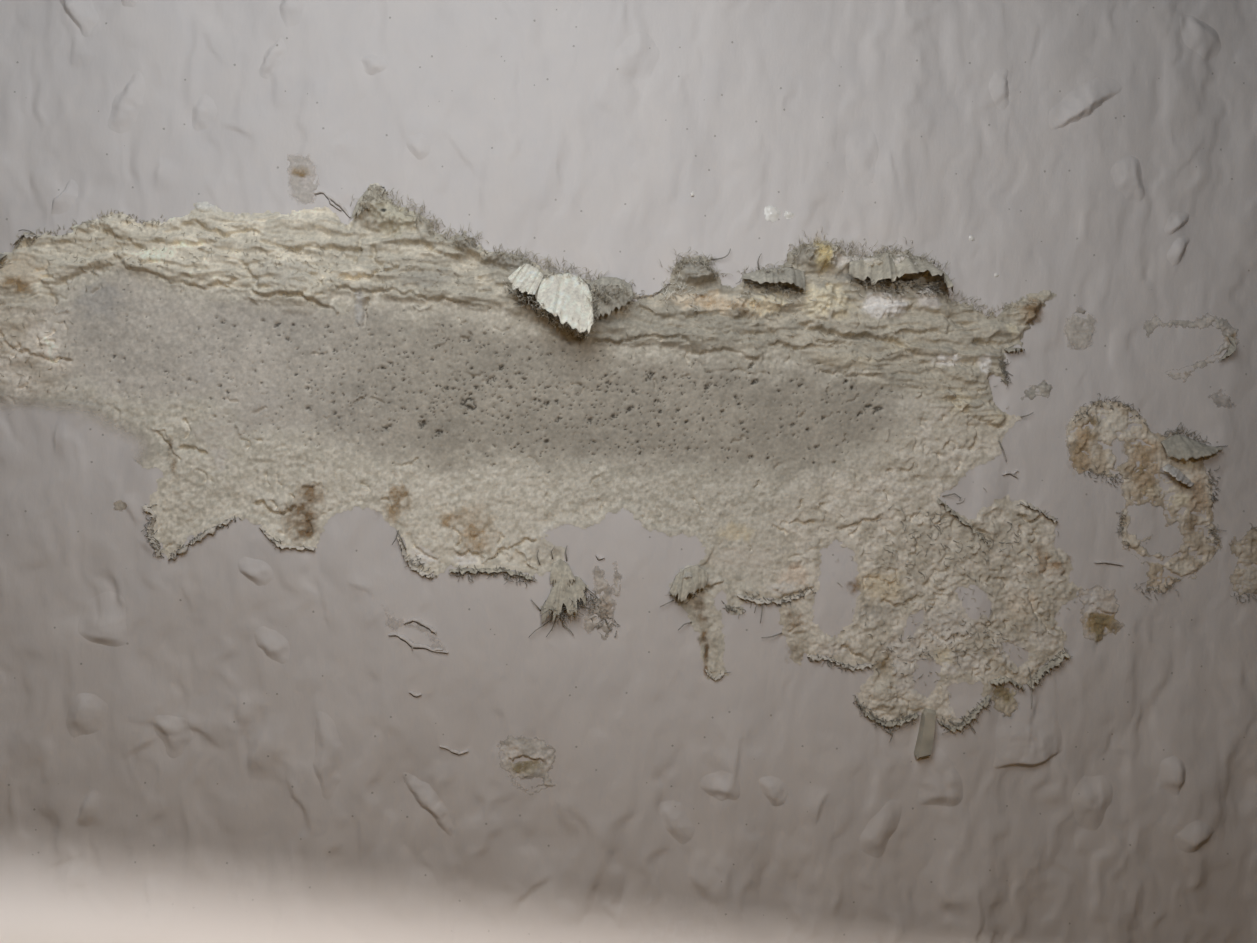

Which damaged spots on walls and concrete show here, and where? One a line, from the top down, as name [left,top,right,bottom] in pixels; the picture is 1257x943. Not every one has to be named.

peeling [0,156,1124,741]
peeling [1066,393,1257,604]
peeling [1144,314,1239,381]
peeling [499,736,555,795]